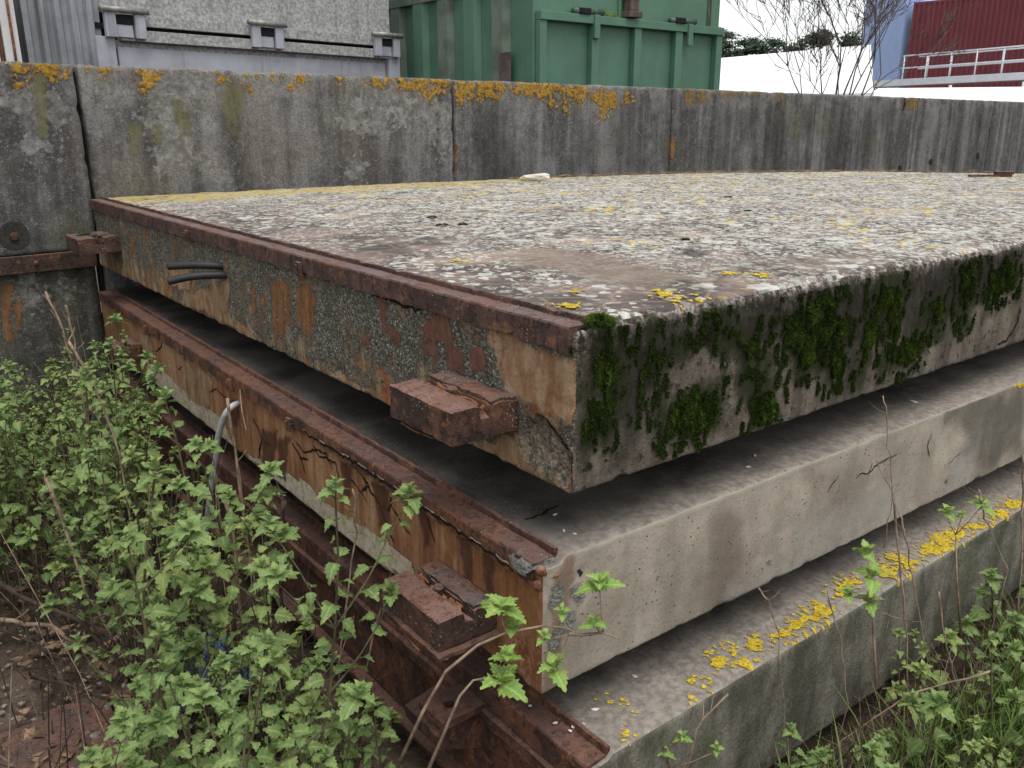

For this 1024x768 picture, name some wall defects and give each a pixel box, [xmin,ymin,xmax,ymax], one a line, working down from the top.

corrosion [1,284,23,342]
corrosion [251,281,315,336]
corrosion [230,399,239,426]
corrosion [261,429,290,481]
corrosion [341,462,352,497]
corrosion [370,482,390,524]
crack [292,429,513,572]
crack [525,505,558,520]
crack [829,454,897,490]